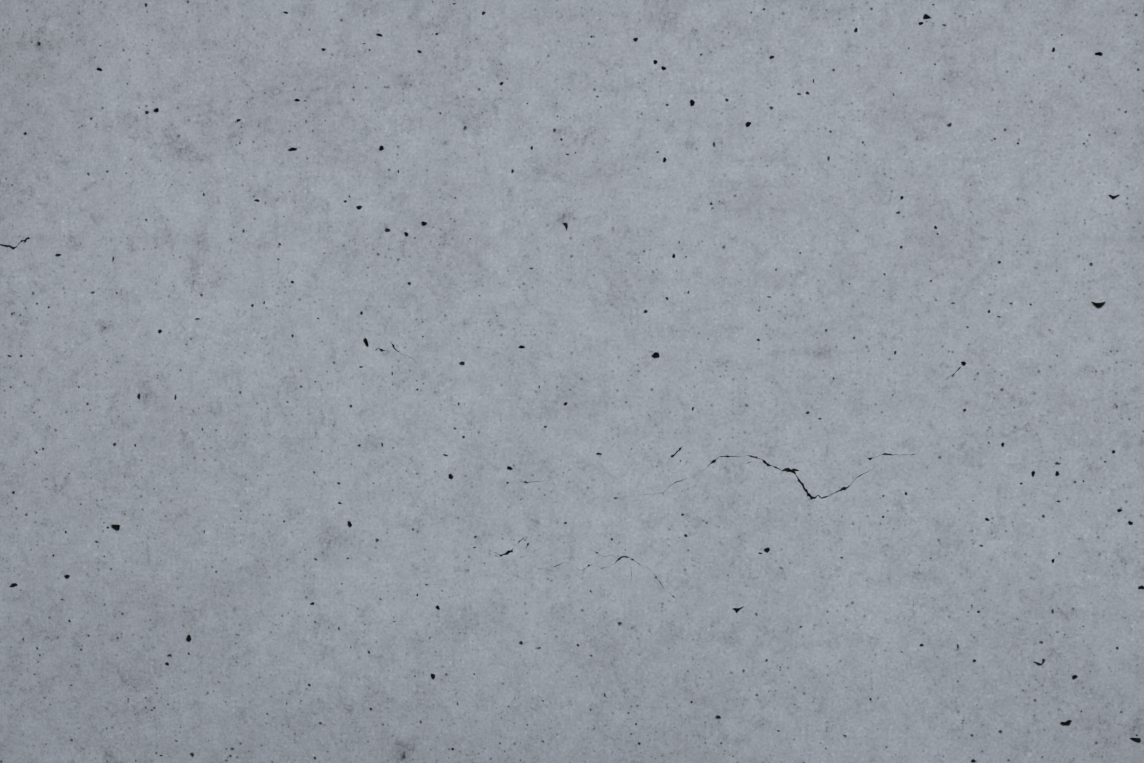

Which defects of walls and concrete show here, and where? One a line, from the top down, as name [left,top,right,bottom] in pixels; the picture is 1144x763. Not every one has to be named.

crack [614,453,917,500]